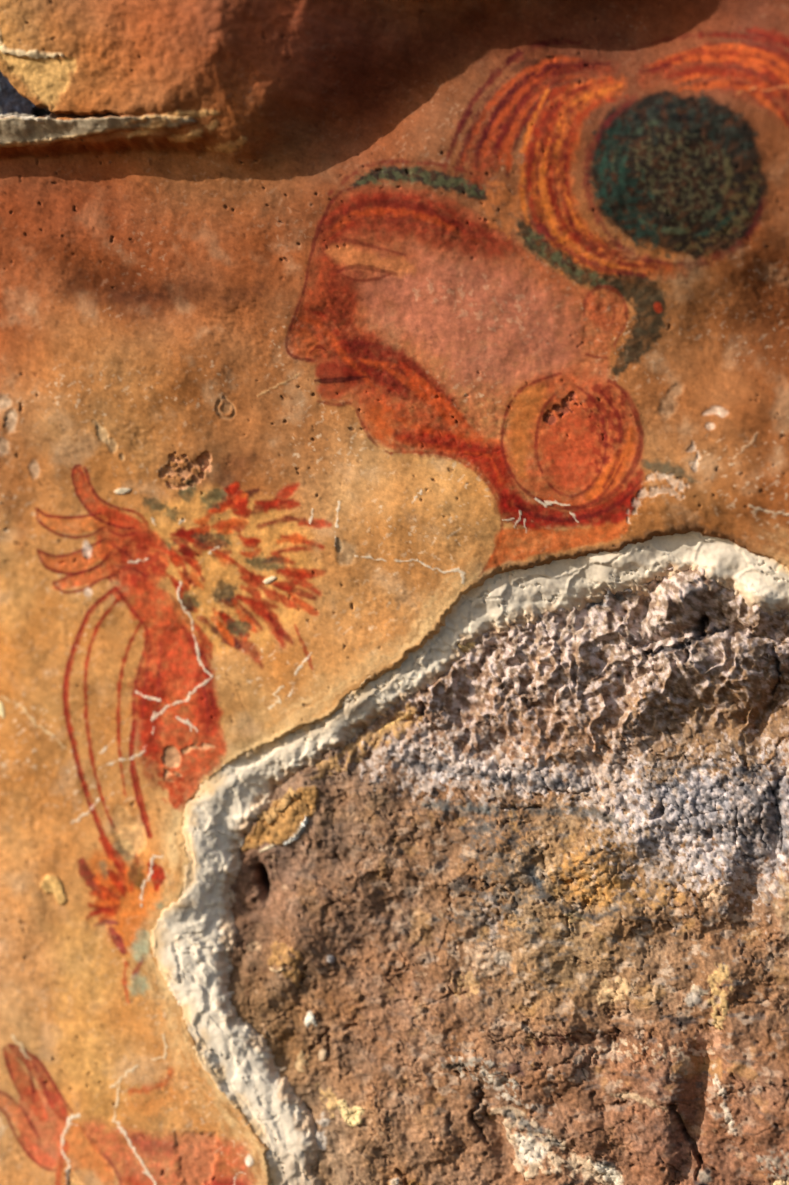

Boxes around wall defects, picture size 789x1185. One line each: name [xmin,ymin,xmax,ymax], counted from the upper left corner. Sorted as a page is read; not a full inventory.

peeling [0,28,249,155]
crack [127,556,149,564]
crack [150,516,186,527]
crack [207,545,221,555]
peeling [334,537,360,567]
crack [0,695,68,749]
crack [70,580,214,825]
crack [267,651,313,710]
peeling [161,741,216,783]
spalling [227,566,789,1185]
crack [109,1033,169,1185]
crack [59,1112,81,1185]